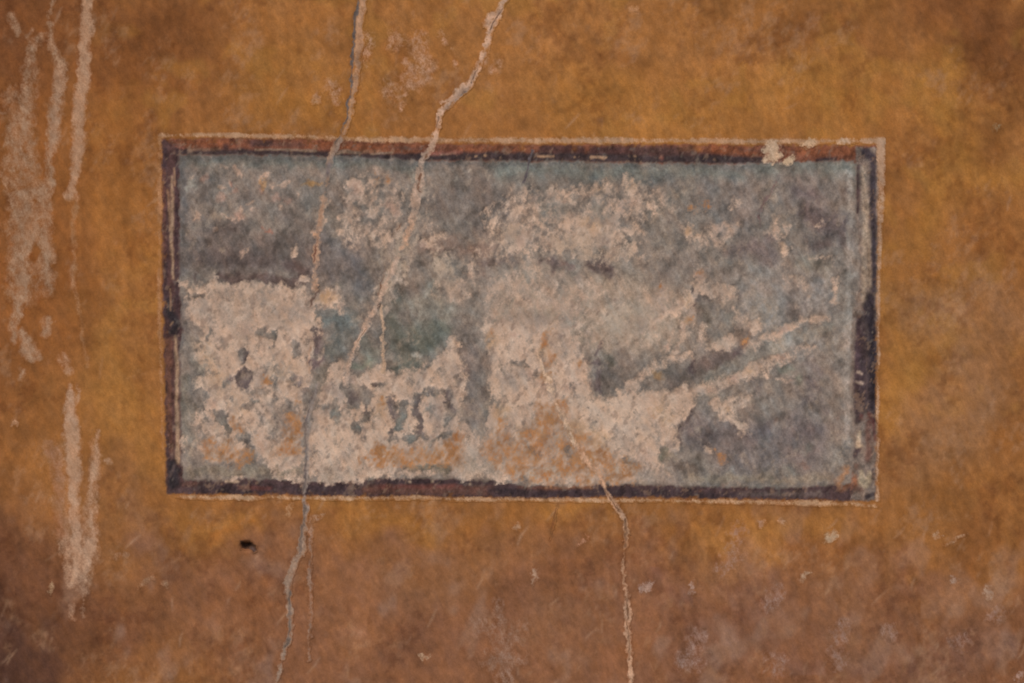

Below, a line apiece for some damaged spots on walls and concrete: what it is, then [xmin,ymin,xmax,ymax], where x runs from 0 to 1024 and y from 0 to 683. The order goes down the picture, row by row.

leakage [0,0,114,622]
crack [273,0,509,683]
peeling [175,165,842,490]
peeling [760,136,819,167]
crack [536,351,635,683]